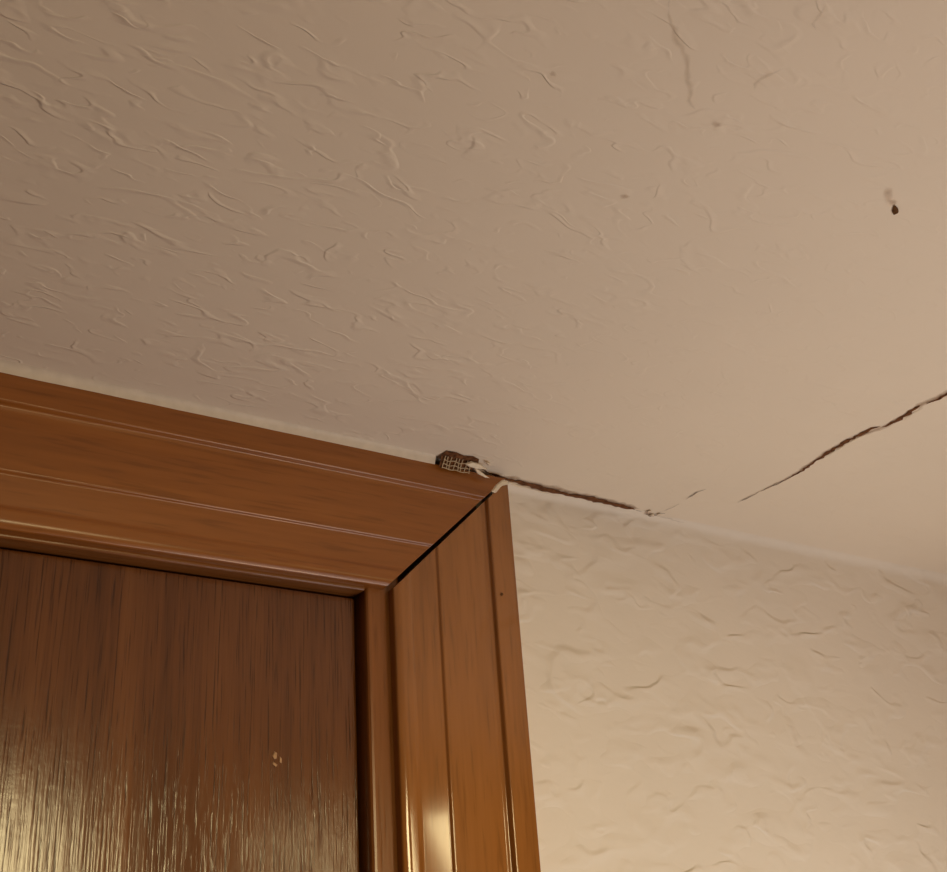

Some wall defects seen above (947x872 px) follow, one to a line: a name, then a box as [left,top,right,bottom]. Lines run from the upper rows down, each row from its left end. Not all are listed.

spalling [439,451,491,478]
crack [742,393,947,501]
crack [482,469,641,512]